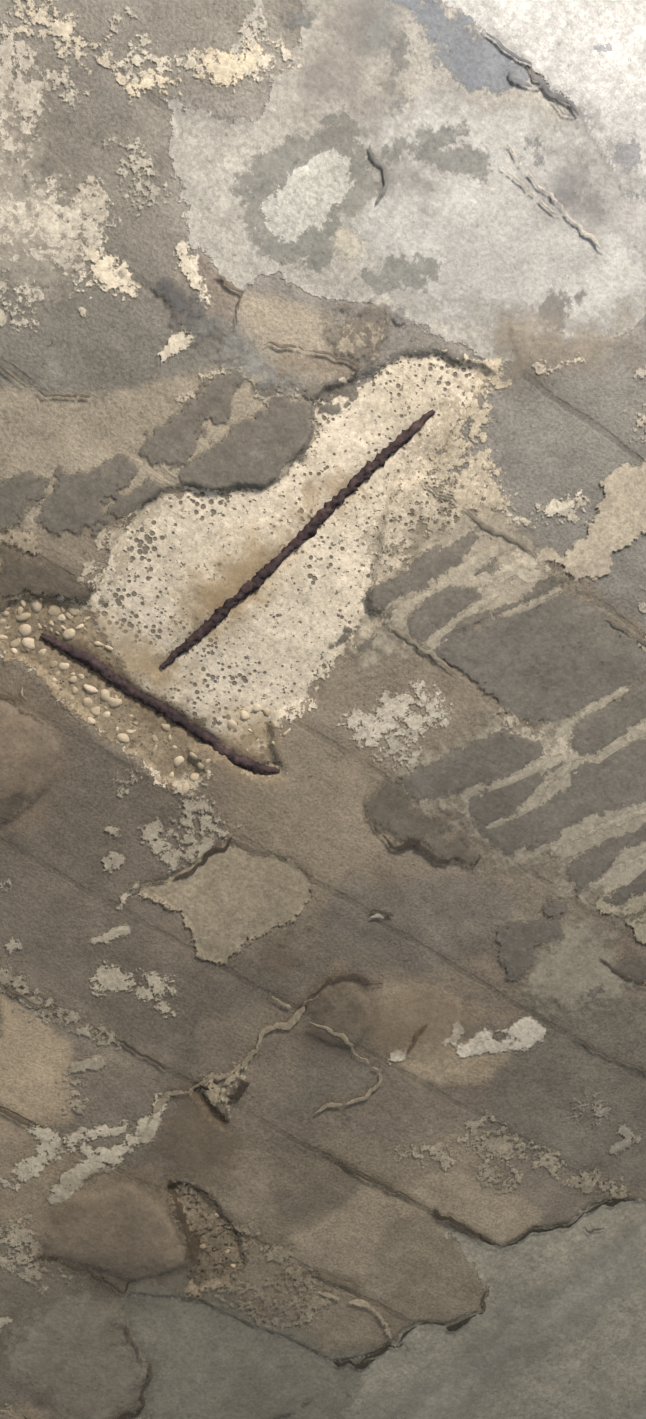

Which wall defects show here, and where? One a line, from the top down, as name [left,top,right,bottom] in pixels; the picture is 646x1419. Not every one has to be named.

leakage [532,351,586,375]
spalling [0,0,646,1017]
leakage [506,489,591,528]
leakage [385,542,562,650]
leakage [336,680,454,775]
leakage [483,686,646,829]
leakage [588,851,646,889]
crack [0,982,66,1016]
crack [113,973,427,1124]
crack [600,959,646,986]
crack [307,1148,630,1248]
peeling [0,1174,646,1419]